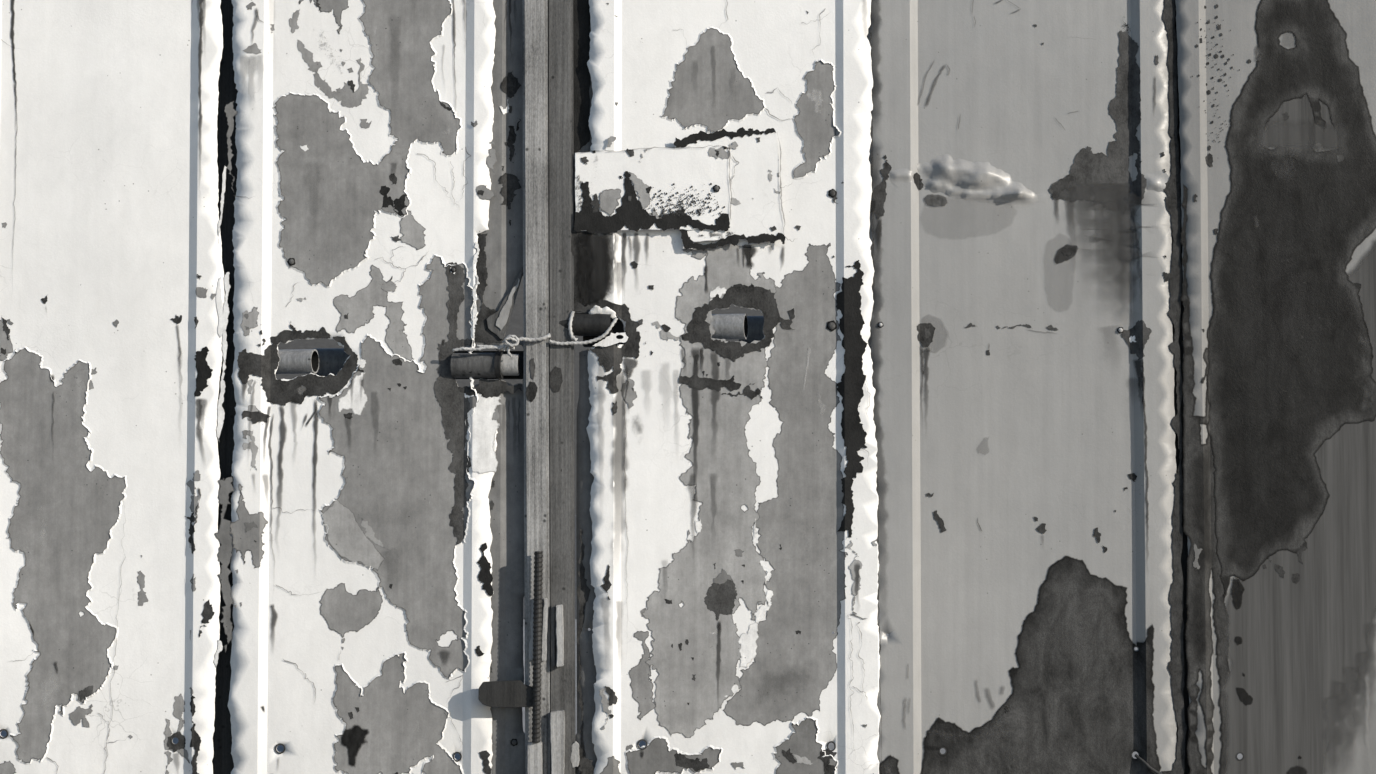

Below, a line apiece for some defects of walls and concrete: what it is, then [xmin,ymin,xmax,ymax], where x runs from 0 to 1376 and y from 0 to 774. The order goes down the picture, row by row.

rust [10,0,18,238]
peeling [660,26,766,159]
peeling [768,59,841,194]
rust [913,173,924,190]
peeling [0,318,128,774]
peeling [230,484,268,574]
rust [237,324,364,524]
peeling [243,0,501,774]
peeling [600,243,848,774]
rust [917,323,935,386]
rust [921,0,1376,774]
rust [879,755,900,774]